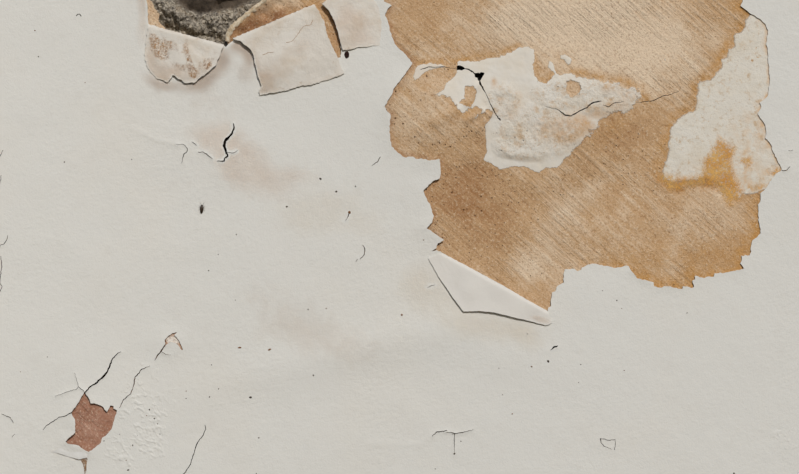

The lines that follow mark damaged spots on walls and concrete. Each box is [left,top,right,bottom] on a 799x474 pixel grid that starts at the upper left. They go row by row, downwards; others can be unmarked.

crack [420,65,501,120]
crack [178,124,238,162]
peeling [144,0,764,325]
crack [60,352,120,395]
peeling [52,387,117,459]